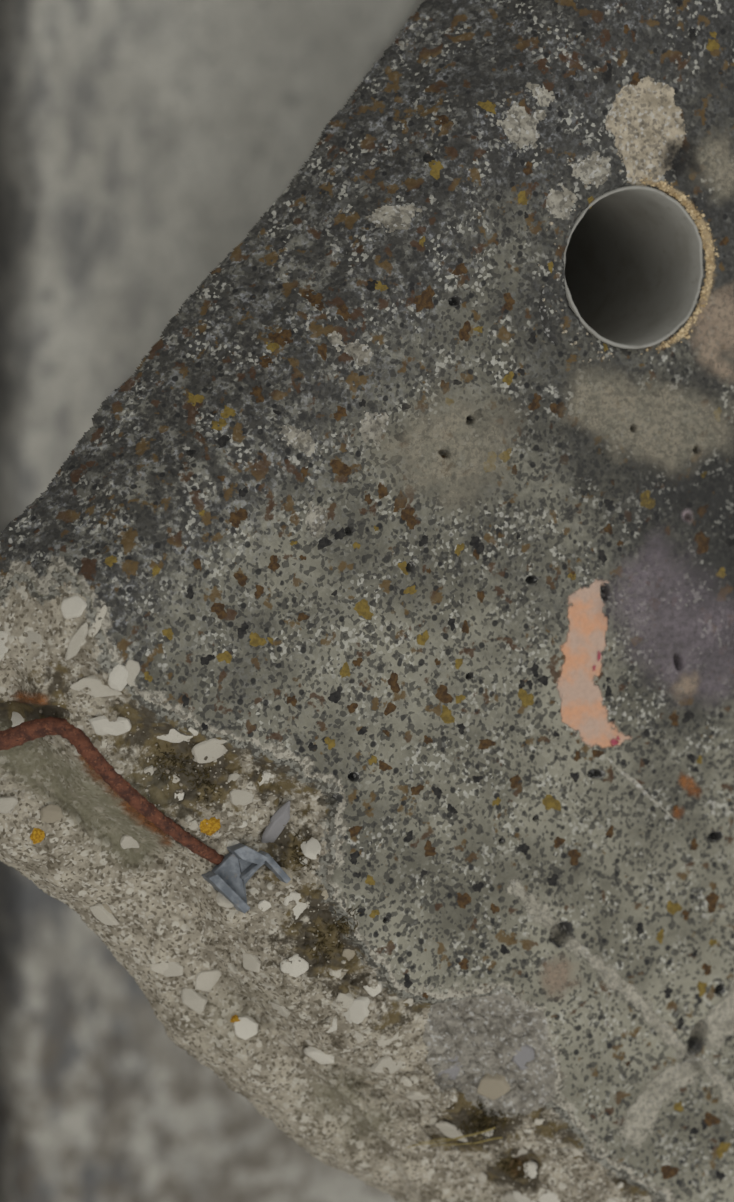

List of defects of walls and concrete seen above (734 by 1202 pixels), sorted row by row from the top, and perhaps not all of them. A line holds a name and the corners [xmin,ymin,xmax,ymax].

spalling [0,568,674,1202]